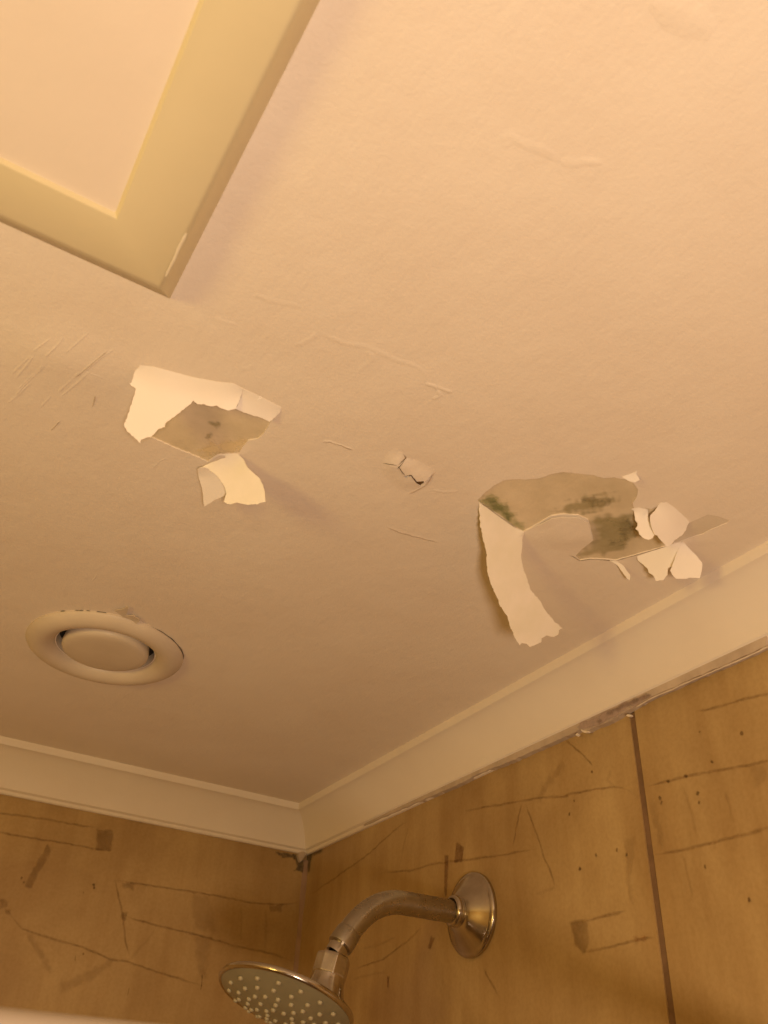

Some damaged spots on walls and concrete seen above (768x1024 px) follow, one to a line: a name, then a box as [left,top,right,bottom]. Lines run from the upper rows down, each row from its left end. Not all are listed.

peeling [124,365,281,507]
peeling [478,471,729,647]